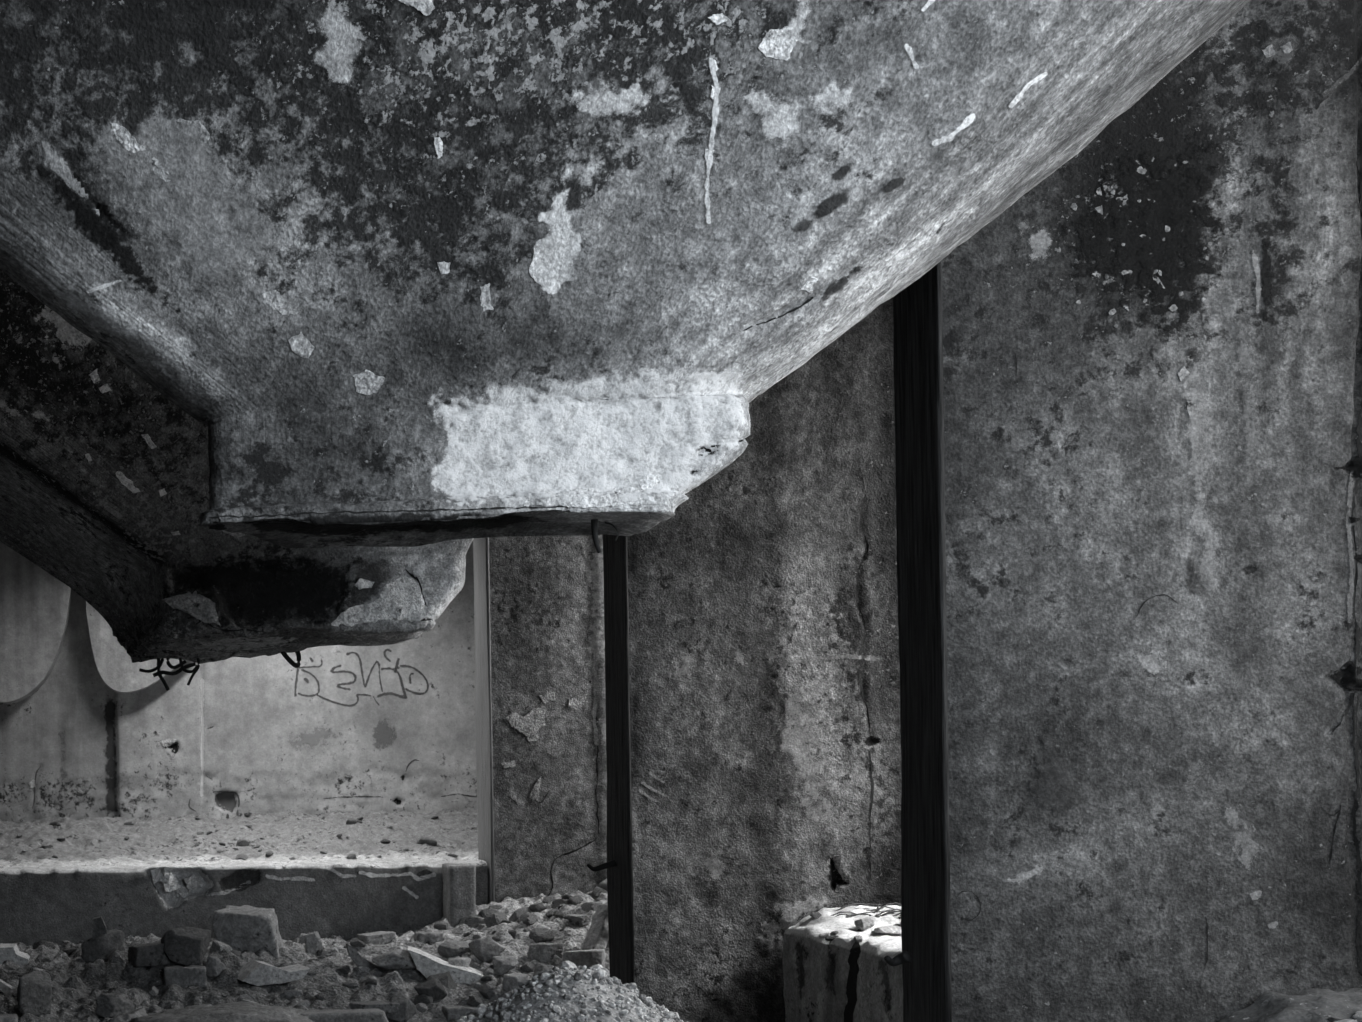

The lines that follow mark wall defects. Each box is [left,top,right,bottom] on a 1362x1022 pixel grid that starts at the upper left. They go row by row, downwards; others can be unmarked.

peeling [314,7,362,83]
spalling [529,165,581,294]
peeling [758,0,810,61]
damp [1017,134,1225,340]
crack [1316,57,1362,110]
crack [1354,123,1362,212]
damp [1231,238,1274,459]
flaking render [429,369,751,553]
damp [1176,356,1222,597]
flaking render [331,564,433,627]
crack [855,495,880,882]
crack [1324,383,1362,974]